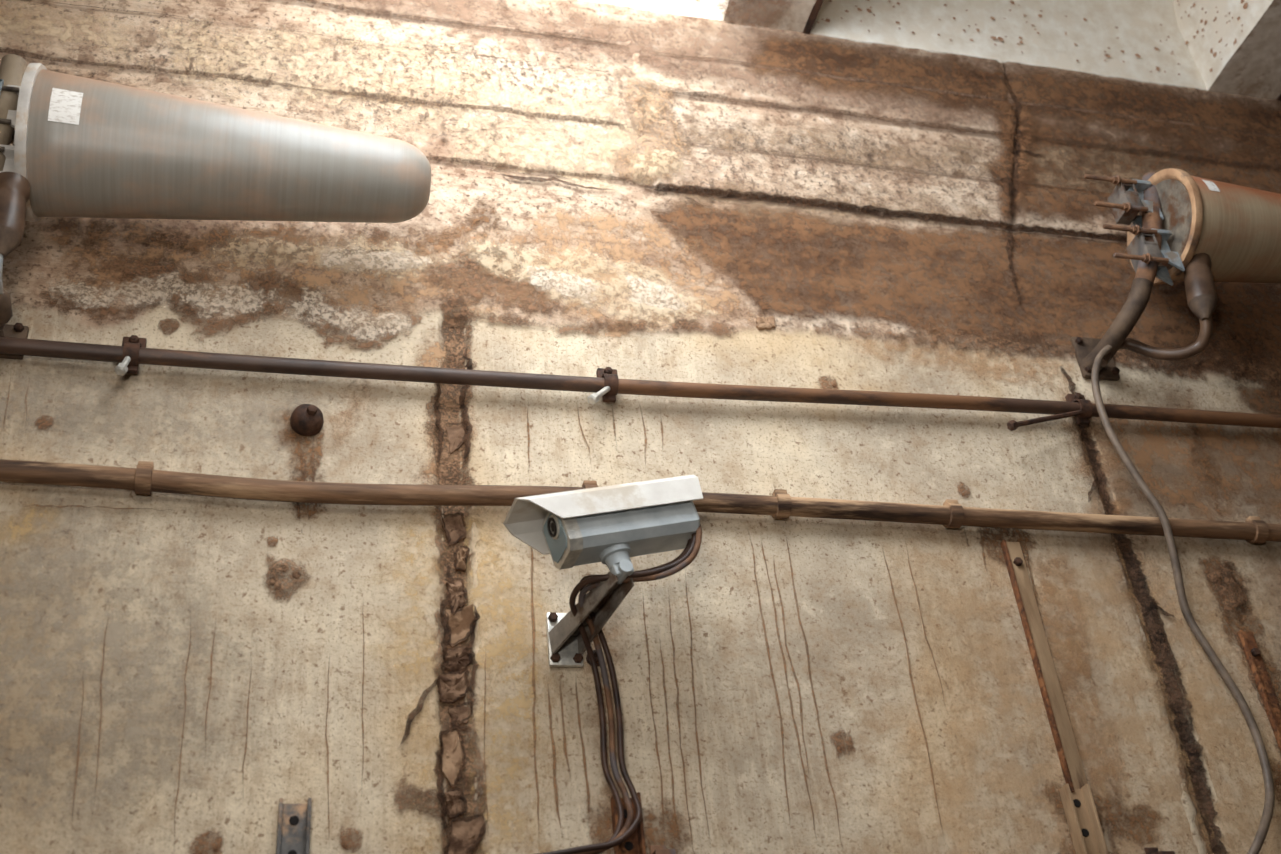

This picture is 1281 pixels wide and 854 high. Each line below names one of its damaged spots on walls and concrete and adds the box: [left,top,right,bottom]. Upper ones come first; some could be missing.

crack [502,174,612,190]
water stain [0,0,1281,367]
crack [643,62,1127,303]
corrosion [279,411,323,482]
crack [401,511,486,854]
crack [433,350,472,462]
corrosion [977,527,1035,567]
crack [1061,366,1227,854]
water stain [1100,281,1281,520]
corrosion [1199,556,1281,801]
corrosion [190,831,223,854]